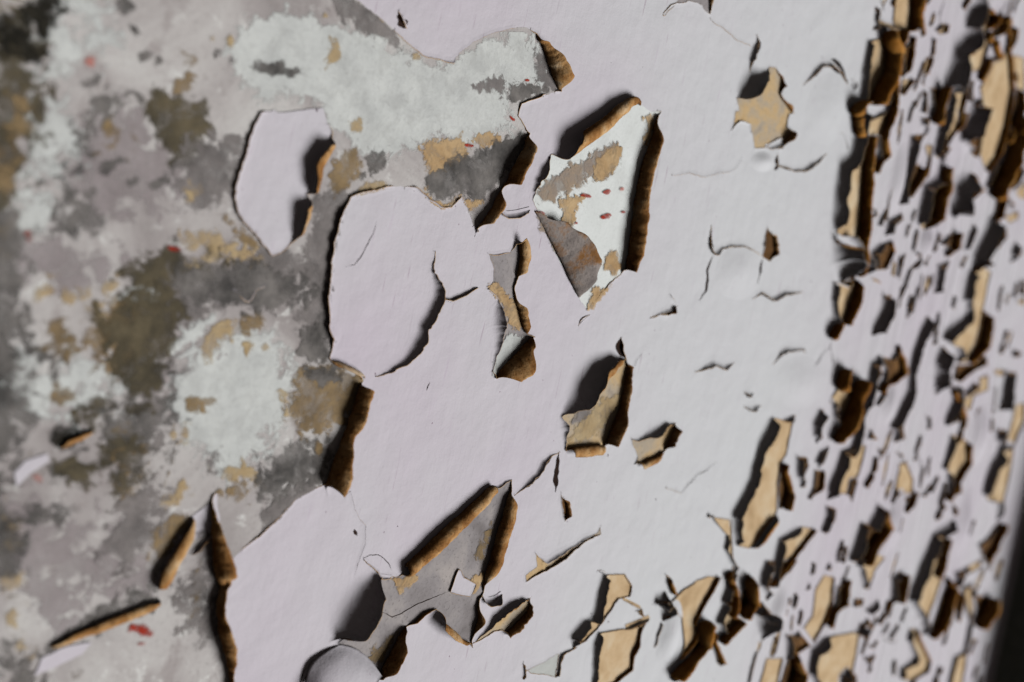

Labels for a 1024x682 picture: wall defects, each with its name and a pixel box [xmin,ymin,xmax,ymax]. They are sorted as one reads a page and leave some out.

flaking render [0,0,683,682]
peeling [521,0,1024,682]